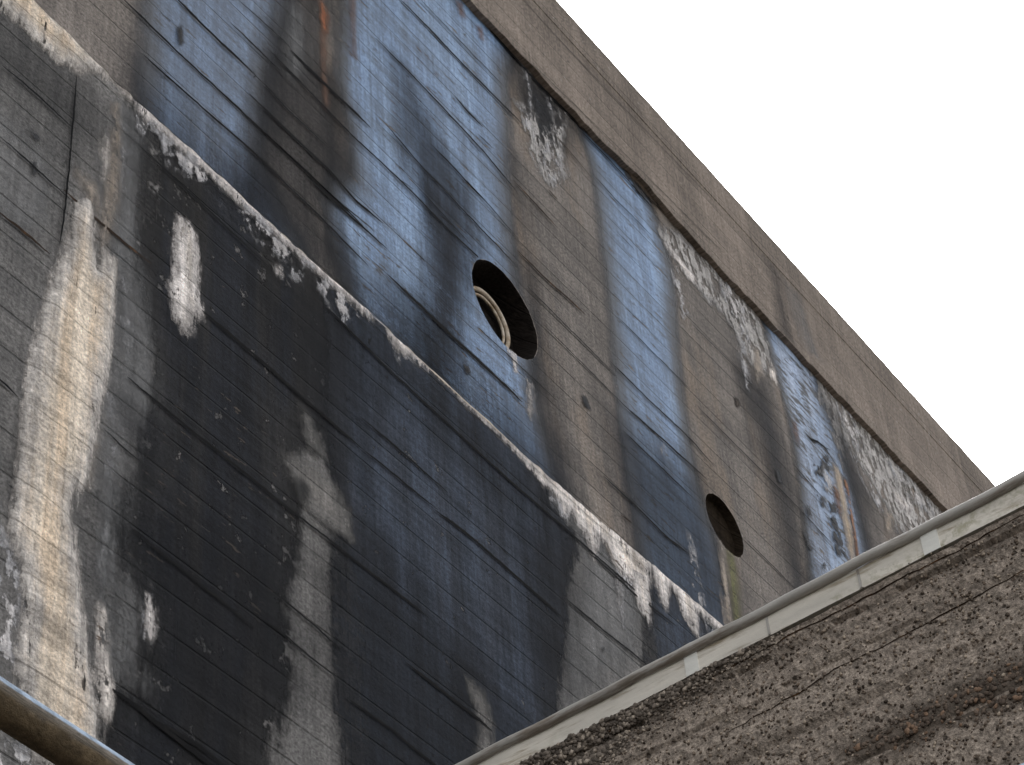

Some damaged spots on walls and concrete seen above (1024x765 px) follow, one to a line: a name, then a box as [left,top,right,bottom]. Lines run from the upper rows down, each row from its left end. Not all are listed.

crack [0,66,150,263]
peeling [517,70,568,188]
spalling [623,169,665,213]
damp [0,0,734,639]
peeling [657,226,777,386]
damp [0,105,131,739]
peeling [807,371,941,557]
damp [364,565,496,765]
crack [670,514,1024,732]